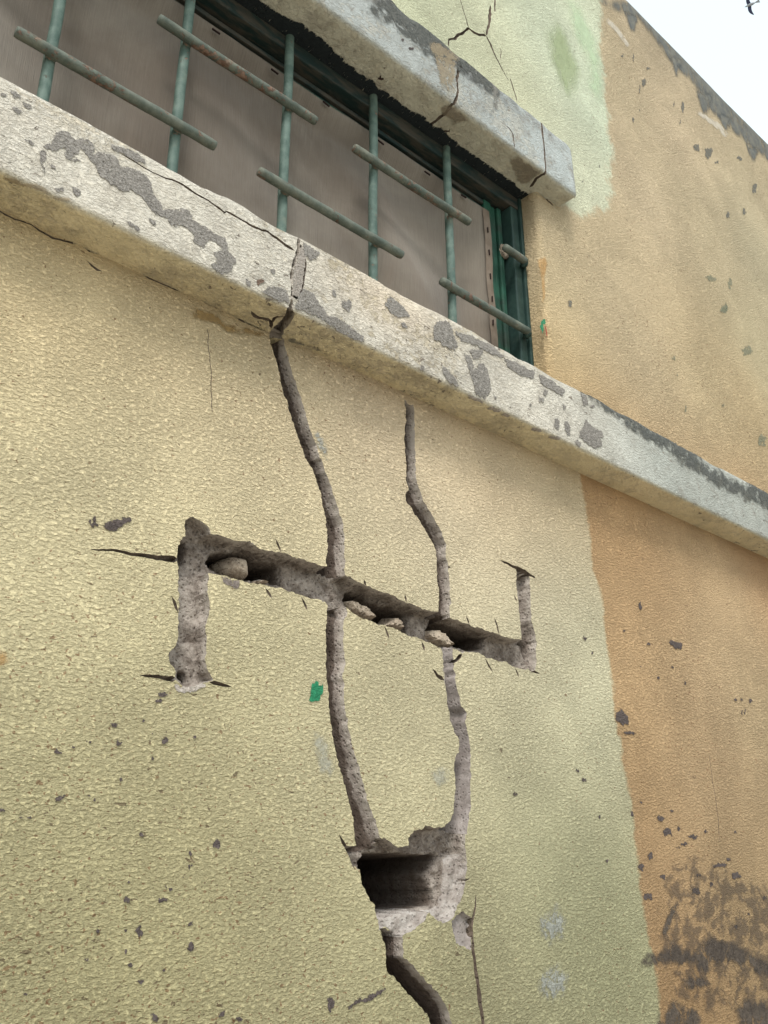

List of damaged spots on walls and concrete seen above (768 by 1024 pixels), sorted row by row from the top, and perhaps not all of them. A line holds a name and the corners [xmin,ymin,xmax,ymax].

peeling [1,91,31,113]
crack [430,0,517,132]
peeling [25,131,236,275]
crack [121,154,346,579]
crack [404,400,452,625]
crack [325,607,380,852]
crack [432,647,471,835]
spalling [339,825,471,950]
crack [380,928,452,1024]
water stain [658,1002,701,1024]
water stain [642,903,768,989]
water stain [737,1000,768,1024]